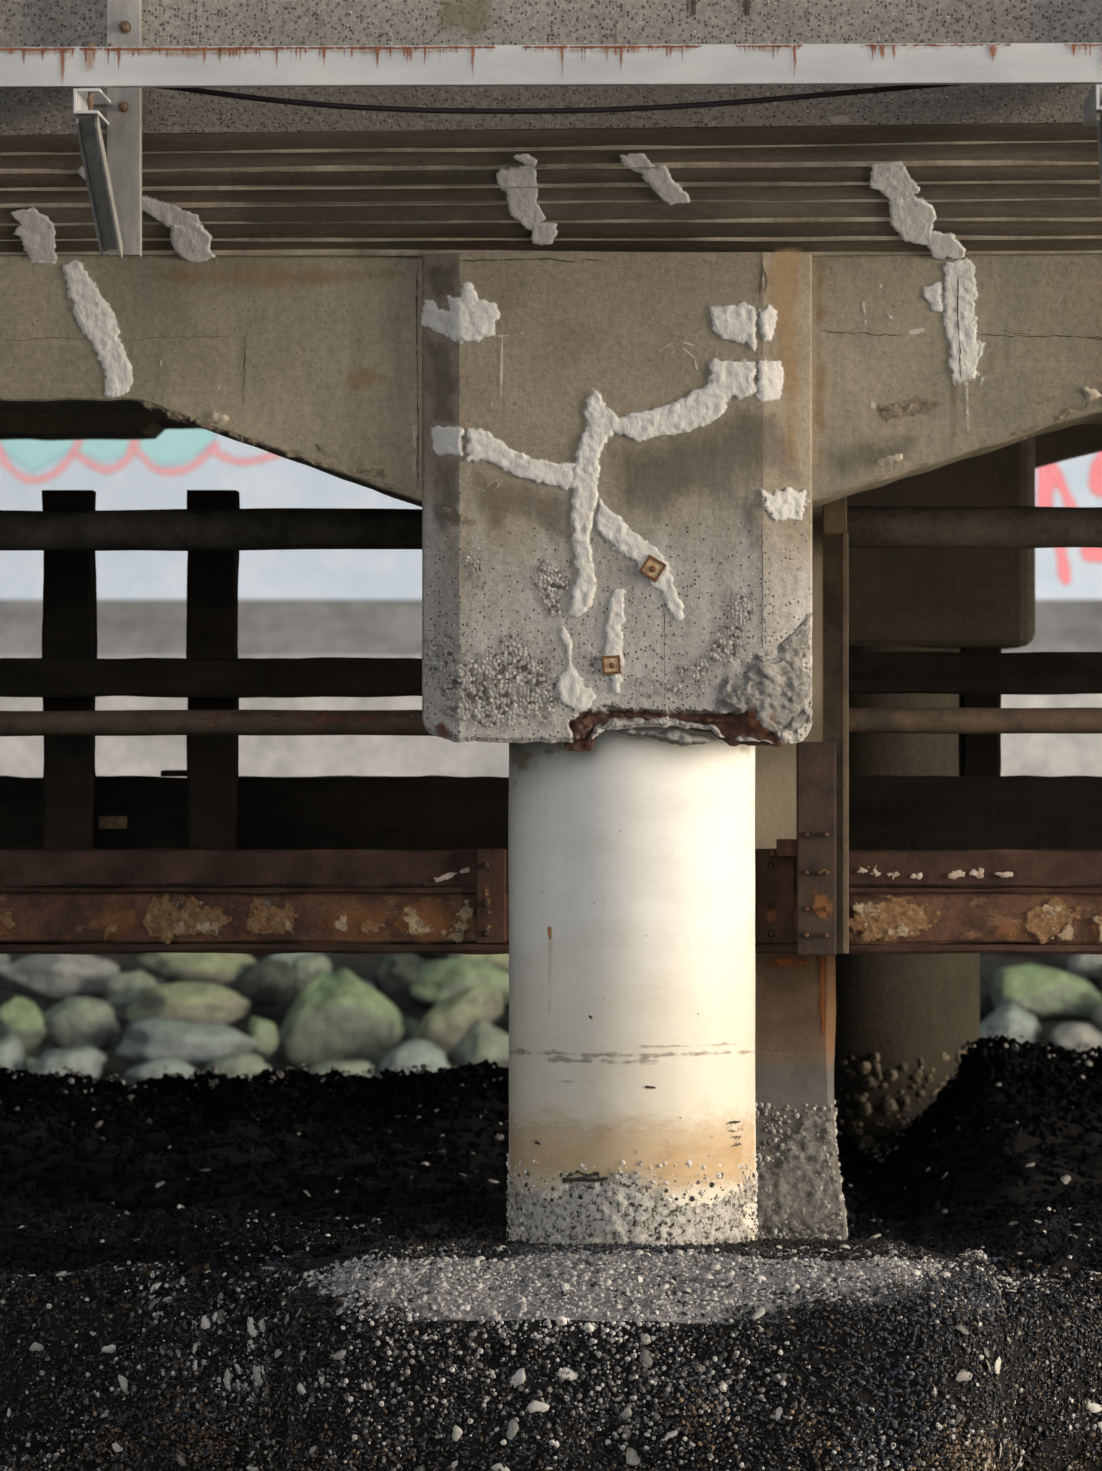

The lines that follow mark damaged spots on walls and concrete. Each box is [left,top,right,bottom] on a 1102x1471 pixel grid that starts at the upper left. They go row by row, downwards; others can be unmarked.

corrosion [0,46,495,79]
corrosion [523,45,701,64]
corrosion [736,45,802,70]
corrosion [865,44,1011,59]
water stain [492,332,524,408]
spalling [1015,387,1102,440]
spalling [877,454,903,465]